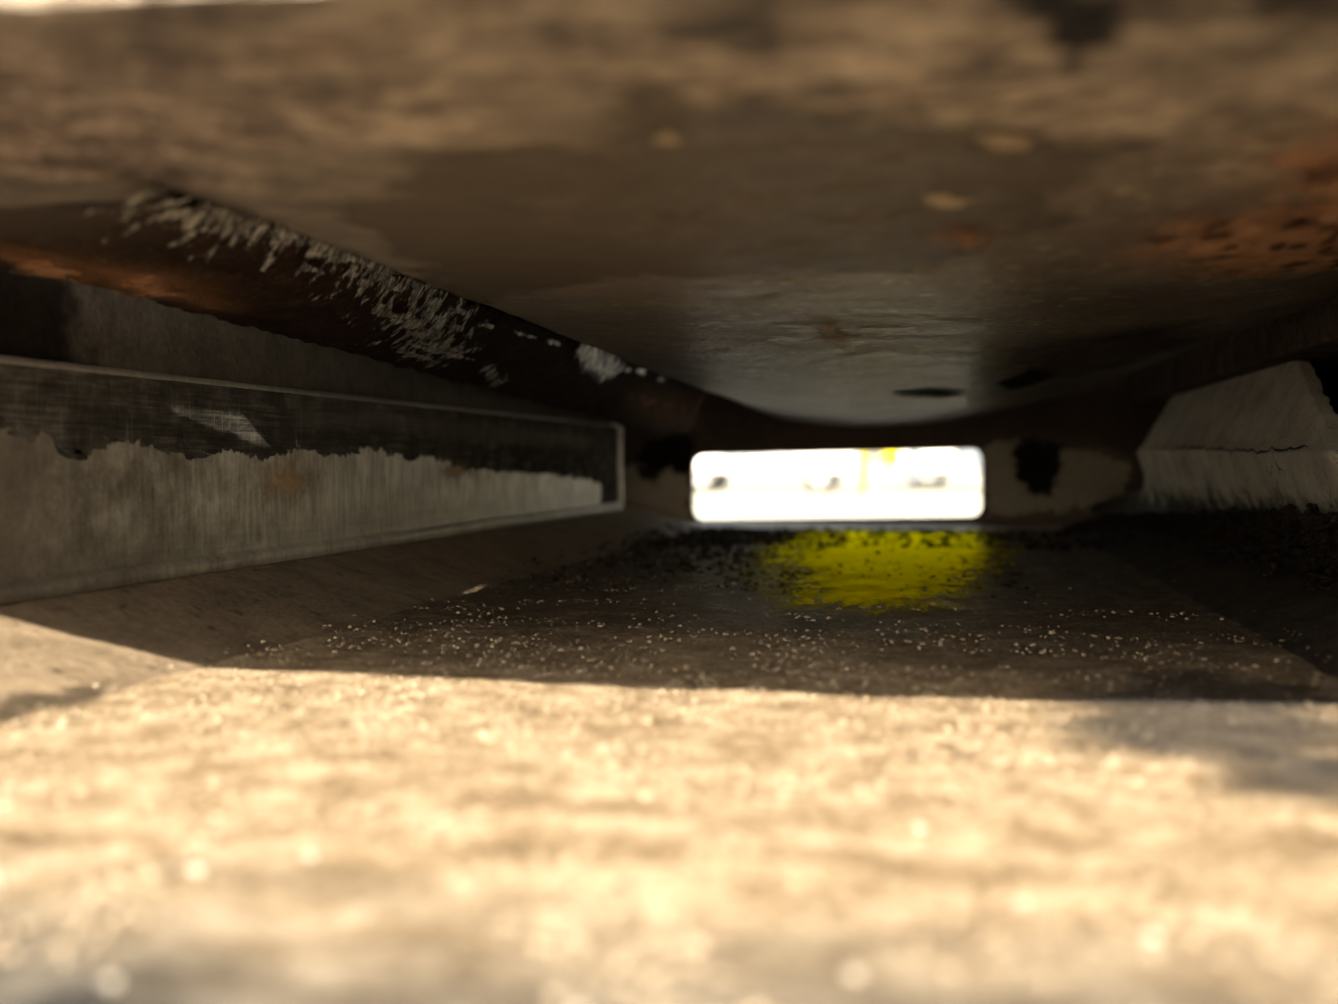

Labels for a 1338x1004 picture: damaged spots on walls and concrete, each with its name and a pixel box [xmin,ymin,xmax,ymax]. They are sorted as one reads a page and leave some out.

corrosion [2,256,82,278]
peeling [0,407,601,582]
leakage [976,434,1133,517]